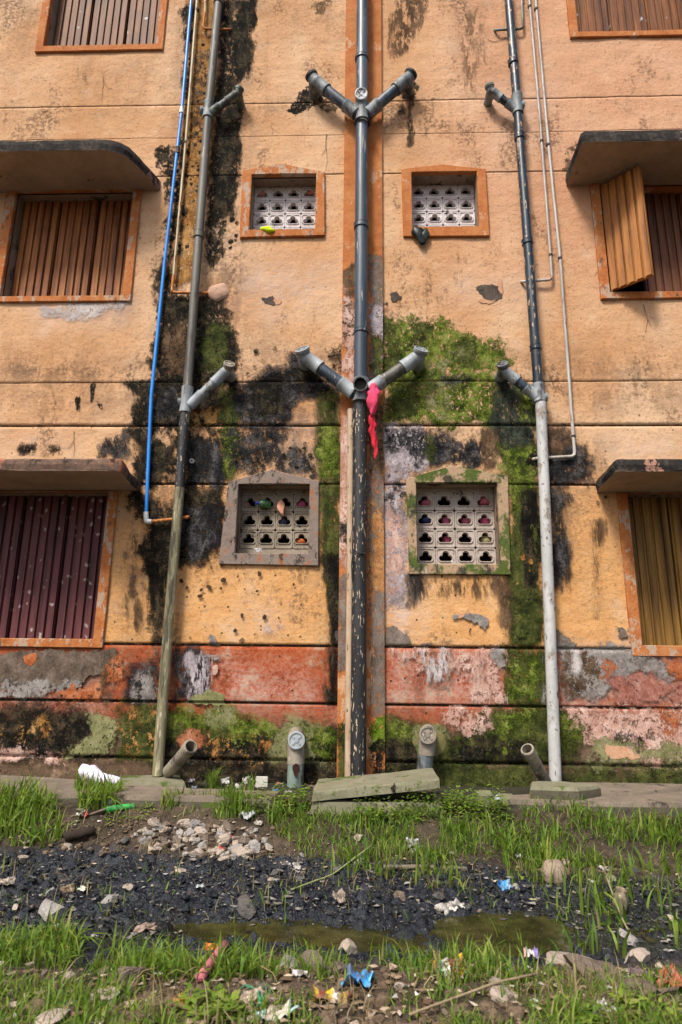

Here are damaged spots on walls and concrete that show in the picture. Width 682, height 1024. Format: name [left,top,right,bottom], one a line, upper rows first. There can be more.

leakage [388,0,427,56]
spalling [262,296,282,306]
spalling [476,279,503,304]
leakage [0,0,342,771]
leakage [383,374,596,641]
peeling [367,402,508,738]
spalling [204,634,222,675]
spalling [0,647,124,760]
peeling [556,626,682,774]
leakage [164,730,288,783]
leakage [432,759,536,788]
leakage [561,757,682,784]